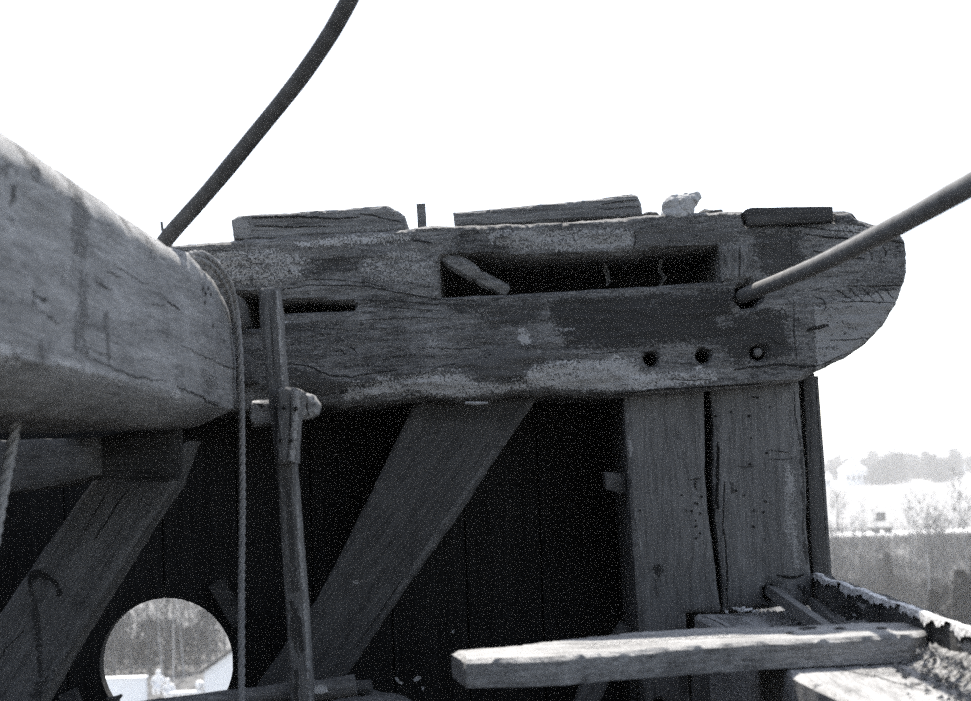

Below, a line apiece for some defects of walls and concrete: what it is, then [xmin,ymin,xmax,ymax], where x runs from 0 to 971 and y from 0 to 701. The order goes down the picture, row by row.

crack [789,226,904,265]
crack [609,284,902,396]
crack [771,397,799,460]
crack [689,442,754,628]
crack [777,572,804,580]